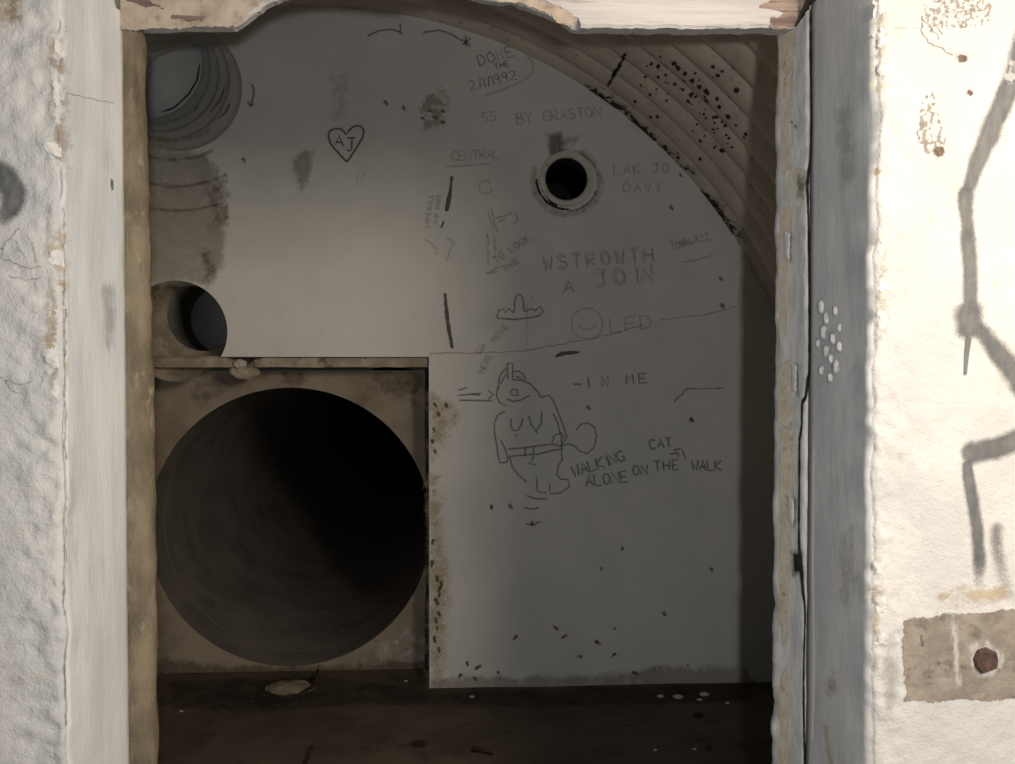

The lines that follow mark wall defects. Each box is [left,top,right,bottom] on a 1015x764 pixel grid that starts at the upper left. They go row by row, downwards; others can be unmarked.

peeling [120,0,262,31]
spalling [493,0,575,27]
corrosion [586,85,702,174]
corrosion [640,56,747,153]
damp [148,138,225,283]
corrosion [700,190,742,237]
corrosion [430,476,445,661]
corrosion [970,642,1004,676]